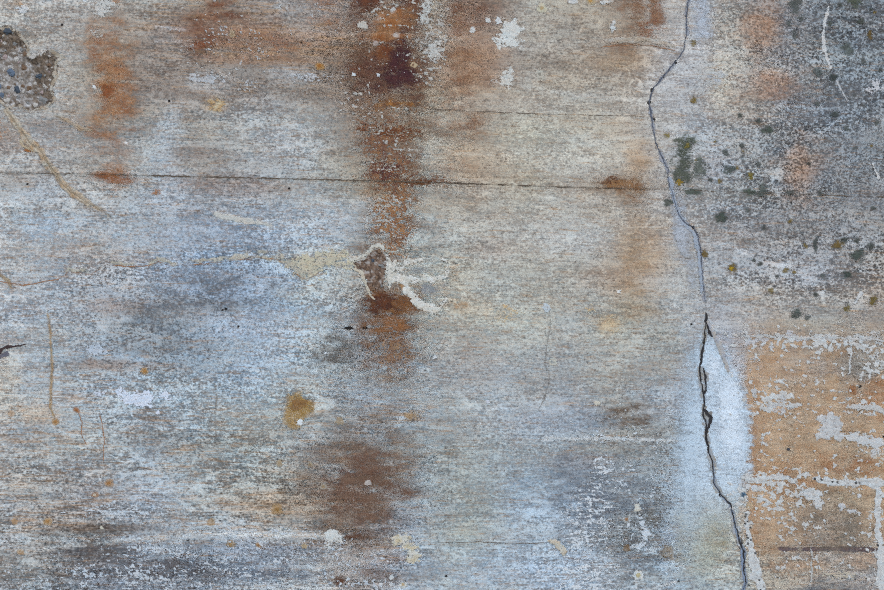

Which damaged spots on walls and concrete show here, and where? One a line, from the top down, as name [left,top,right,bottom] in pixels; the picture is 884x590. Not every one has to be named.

rust [622,0,664,37]
spalling [0,26,65,112]
rust [87,34,136,143]
rust [350,0,458,258]
rust [96,166,130,183]
peeling [278,243,451,314]
rust [360,291,421,371]
crack [603,0,748,590]
rust [285,394,313,427]
rust [320,448,414,541]